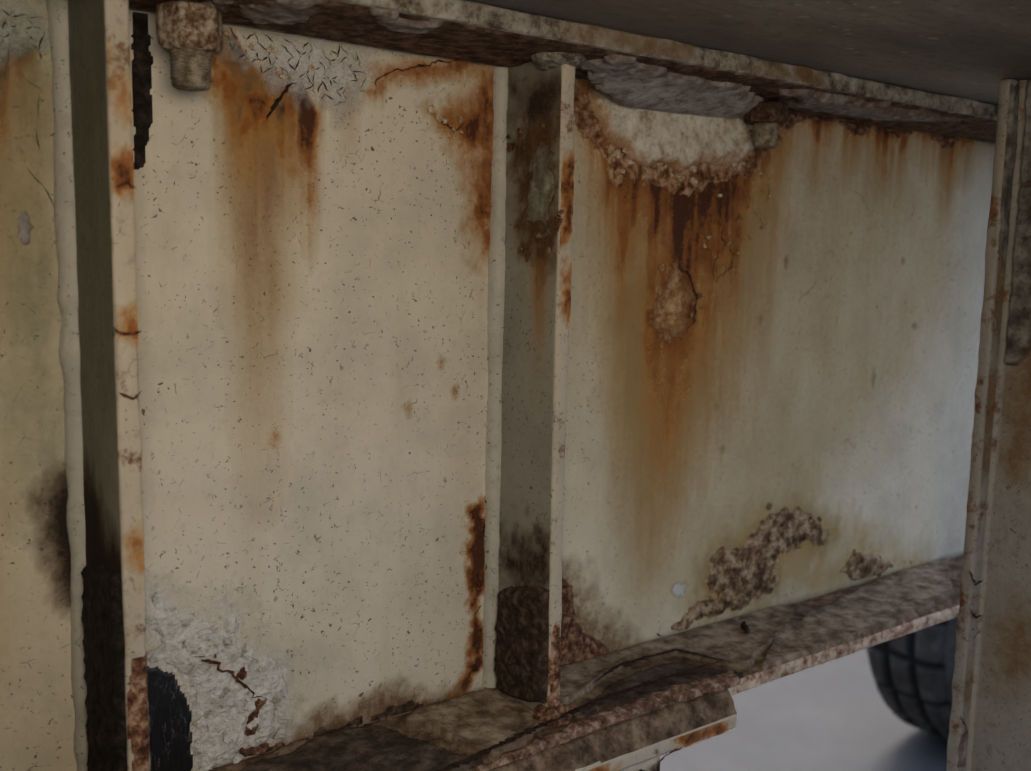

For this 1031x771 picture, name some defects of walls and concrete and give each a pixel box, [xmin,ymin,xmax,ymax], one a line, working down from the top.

rust [128,0,212,12]
rust [0,21,36,137]
rust [110,149,134,195]
peeling [574,54,796,197]
peeling [777,89,961,123]
rust [210,0,998,508]
rust [120,309,139,345]
peeling [145,583,311,771]
rust [208,498,963,771]